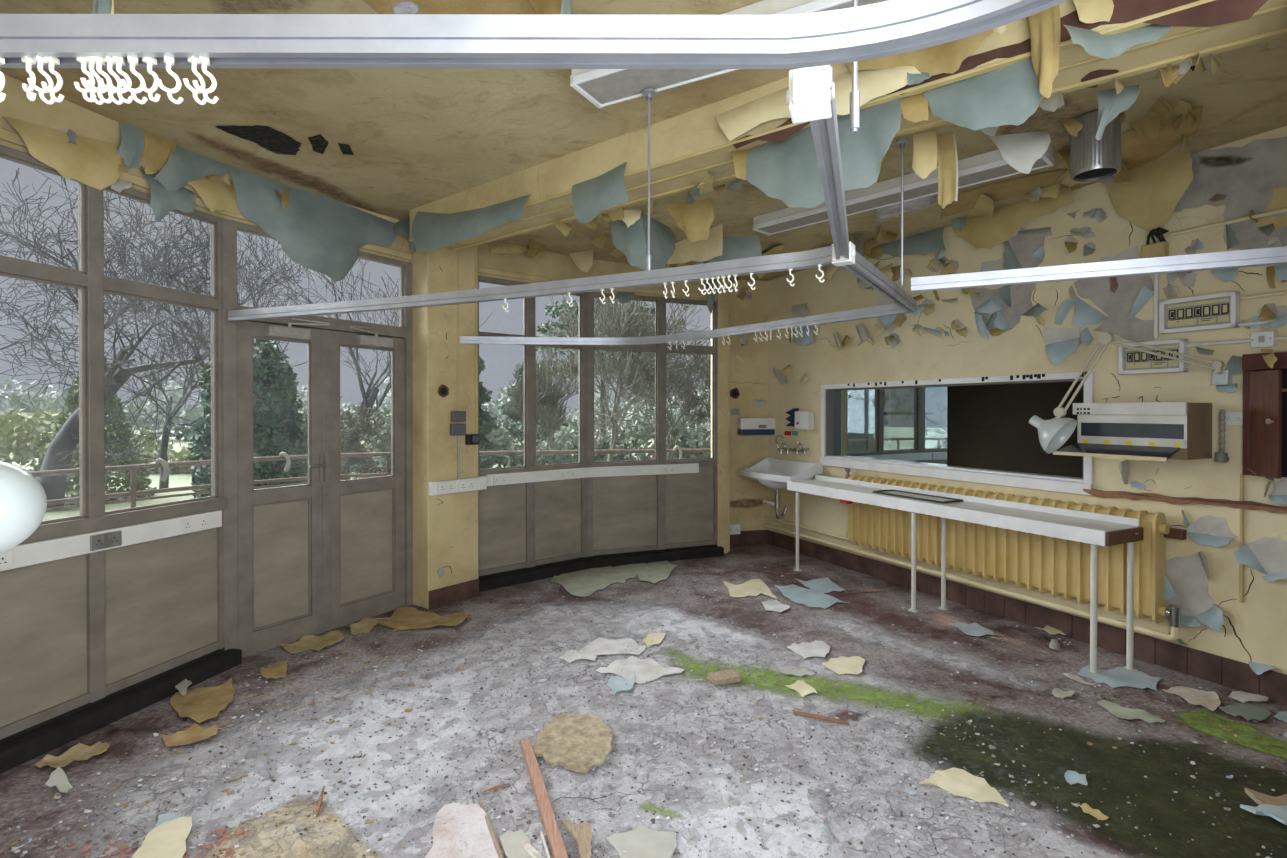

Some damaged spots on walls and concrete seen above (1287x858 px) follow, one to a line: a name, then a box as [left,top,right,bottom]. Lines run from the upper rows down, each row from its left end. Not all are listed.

peeling [92,0,114,14]
peeling [2,116,531,282]
peeling [554,87,825,273]
flaking render [787,0,1287,369]
peeling [617,292,634,303]
peeling [705,272,772,313]
peeling [1216,355,1243,393]
peeling [1247,468,1287,504]
flaking render [1164,509,1287,645]
peeling [1248,661,1275,675]